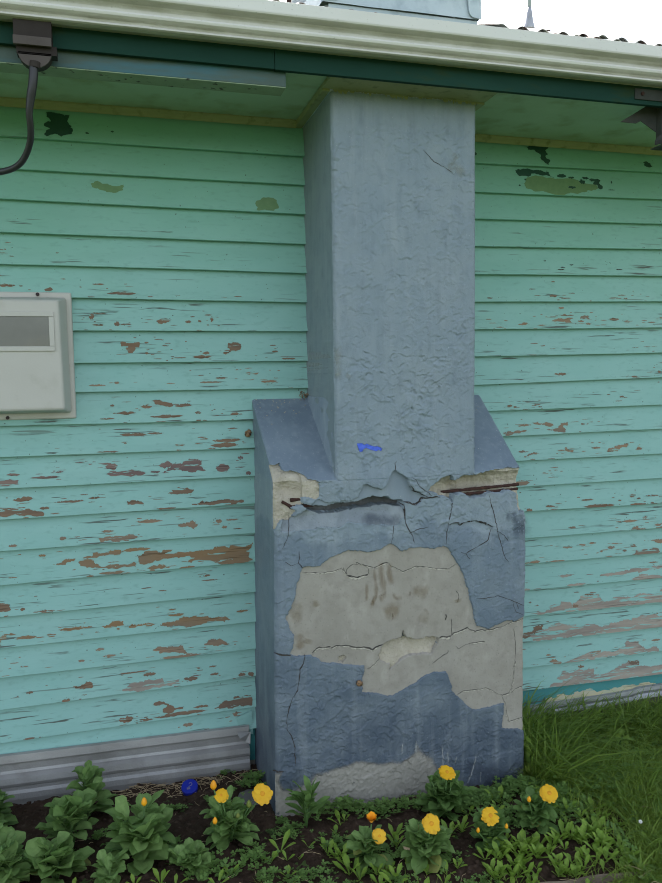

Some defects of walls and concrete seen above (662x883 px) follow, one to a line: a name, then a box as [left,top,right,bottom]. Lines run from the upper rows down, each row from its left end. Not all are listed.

peeling [75,399,251,477]
peeling [0,473,105,518]
peeling [53,496,253,581]
crack [282,465,509,580]
flaking render [269,464,535,532]
rust [441,483,519,495]
peeling [0,603,251,642]
spalling [285,539,662,730]
crack [432,591,524,723]
peeling [119,694,253,728]
crack [273,645,382,773]
peeling [275,749,437,817]